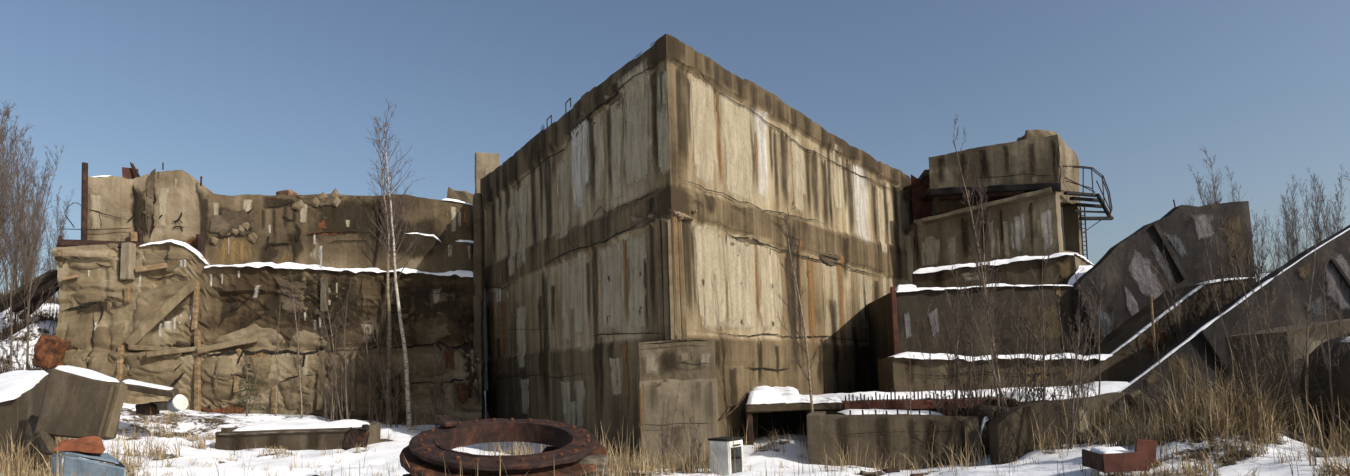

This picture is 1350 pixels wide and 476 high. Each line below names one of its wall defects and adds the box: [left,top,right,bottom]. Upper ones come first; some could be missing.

crack [89,184,184,237]
spalling [207,209,258,245]
spalling [292,188,346,210]
damp [244,197,474,265]
crack [126,58,900,425]
damp [490,63,1052,427]
crack [64,256,189,369]
damp [210,271,373,341]
damp [380,281,508,418]